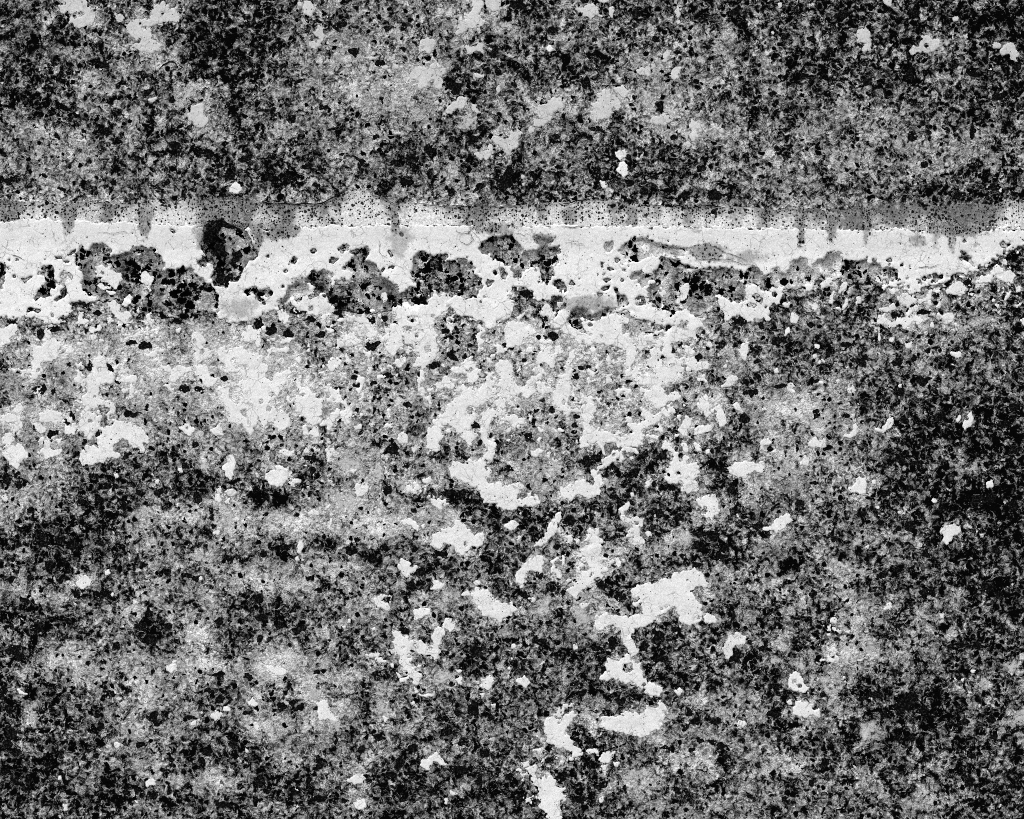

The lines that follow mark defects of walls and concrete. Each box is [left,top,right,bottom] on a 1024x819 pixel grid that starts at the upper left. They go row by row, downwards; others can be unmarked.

damp [1,204,23,222]
damp [59,204,77,235]
damp [134,202,154,238]
damp [190,196,301,250]
damp [387,203,402,234]
damp [468,201,521,235]
damp [558,204,581,225]
damp [623,203,641,227]
damp [792,208,808,247]
damp [823,206,874,244]
damp [909,201,998,252]
peeling [0,216,1024,819]